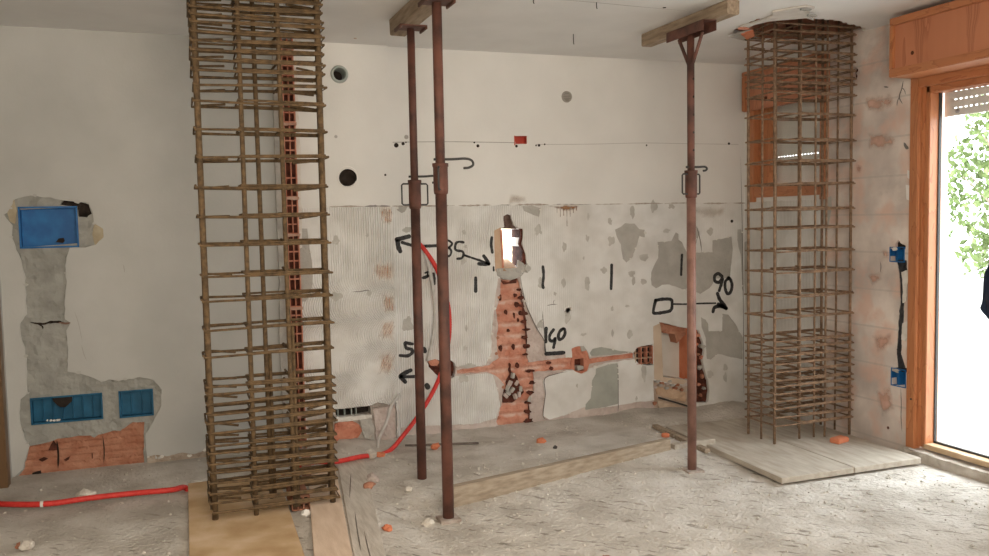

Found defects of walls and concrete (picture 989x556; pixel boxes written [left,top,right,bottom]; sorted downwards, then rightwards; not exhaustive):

flaking render [729,5,865,42]
flaking render [5,194,209,477]
flaking render [282,58,747,447]